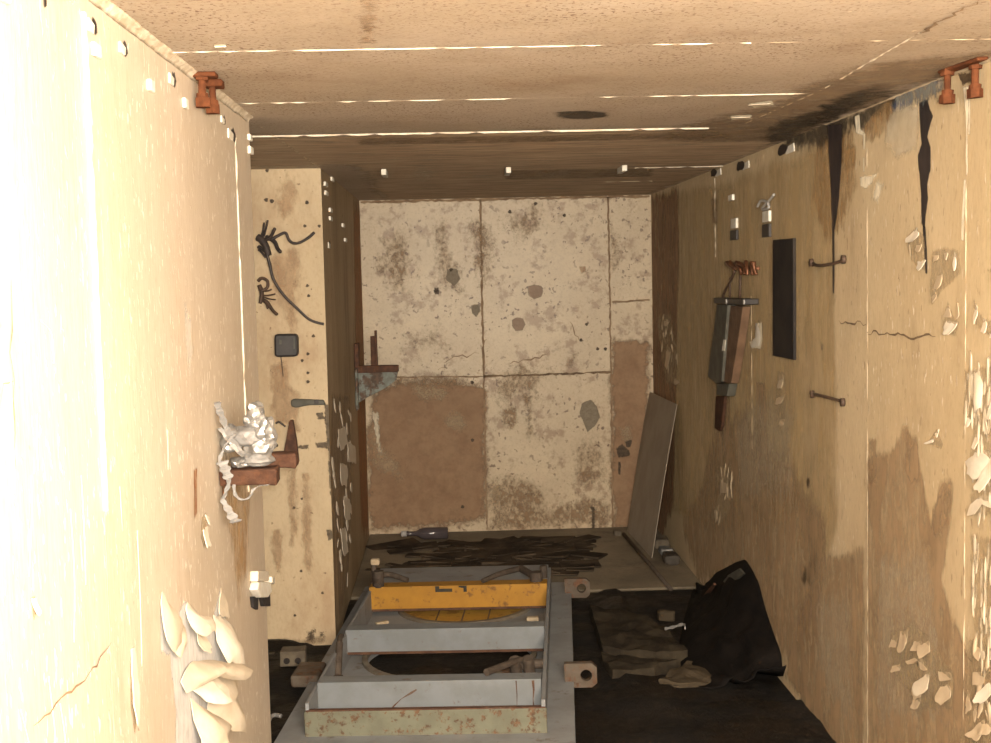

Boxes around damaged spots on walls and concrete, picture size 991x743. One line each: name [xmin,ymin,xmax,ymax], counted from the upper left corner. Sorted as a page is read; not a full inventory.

crack [914,2,978,36]
peeling [905,228,960,303]
crack [839,321,935,349]
peeling [943,303,959,335]
peeling [973,302,991,338]
water stain [250,55,991,743]
peeling [298,395,356,614]
peeling [964,350,991,743]
crack [35,643,111,725]
peeling [160,587,253,743]
peeling [889,624,953,709]